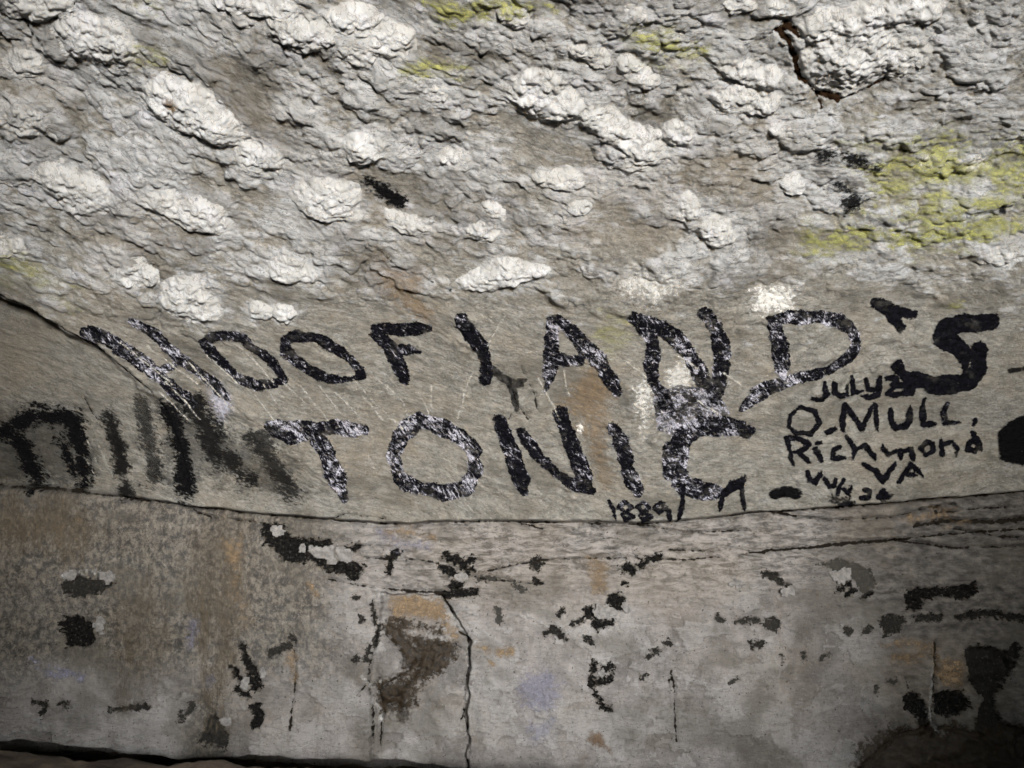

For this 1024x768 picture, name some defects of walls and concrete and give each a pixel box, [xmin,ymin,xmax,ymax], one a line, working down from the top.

crack [774,20,884,109]
crack [328,579,471,768]